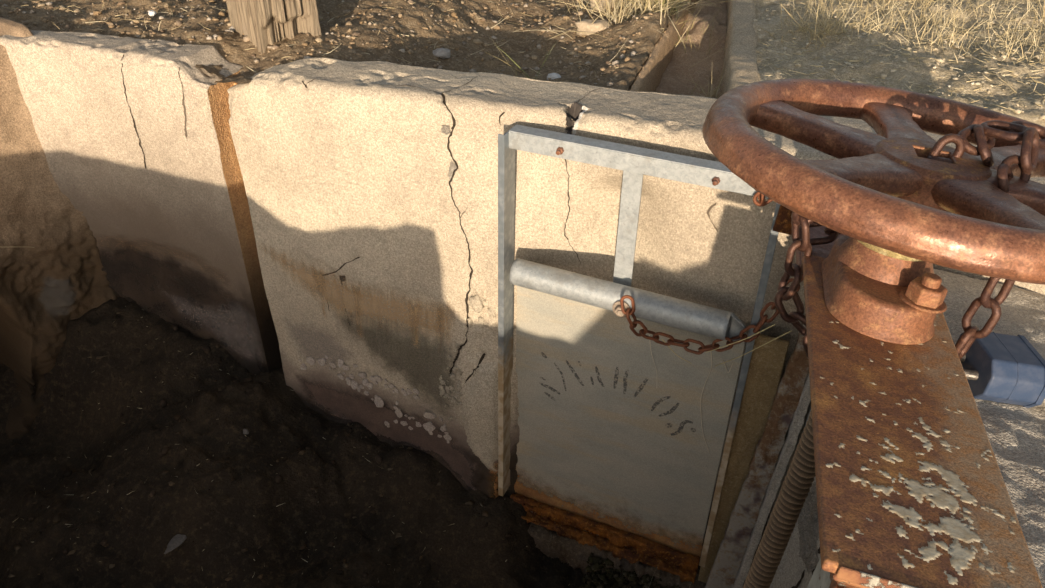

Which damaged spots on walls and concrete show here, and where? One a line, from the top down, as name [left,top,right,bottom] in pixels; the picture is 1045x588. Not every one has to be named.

crack [121,55,146,168]
crack [178,67,187,137]
crack [379,78,486,384]
crack [564,159,581,263]
rust [514,474,703,557]
peeling [826,382,1017,588]